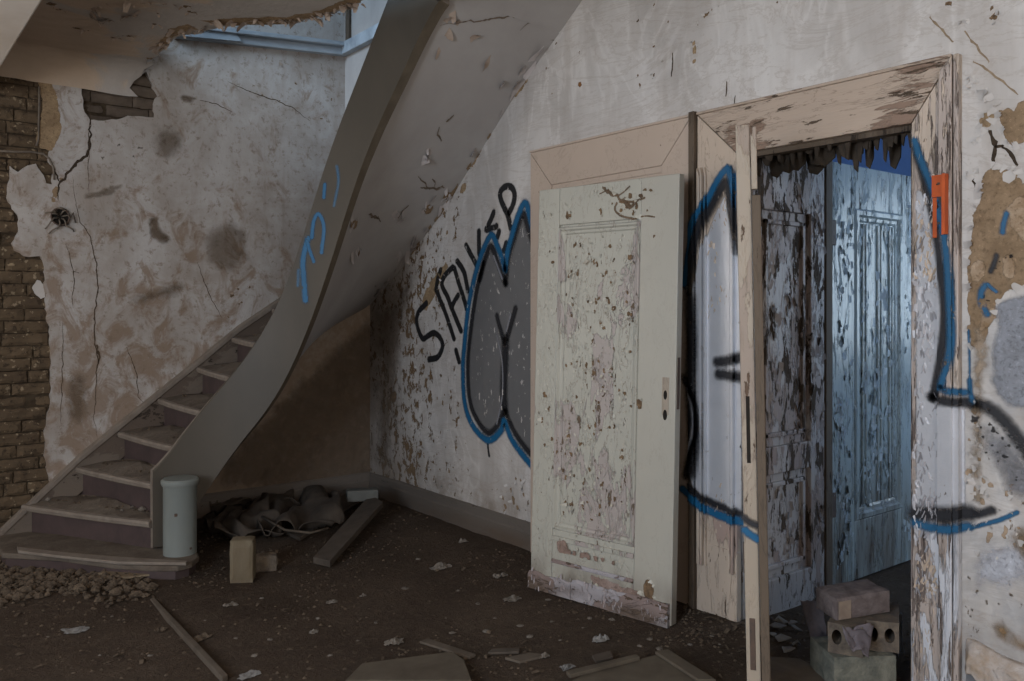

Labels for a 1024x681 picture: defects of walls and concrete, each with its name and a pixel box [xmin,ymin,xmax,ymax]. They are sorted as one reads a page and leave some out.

spalling [73,0,366,127]
peeling [975,88,1024,150]
crack [55,102,101,439]
peeling [374,183,467,311]
peeling [962,162,1024,562]